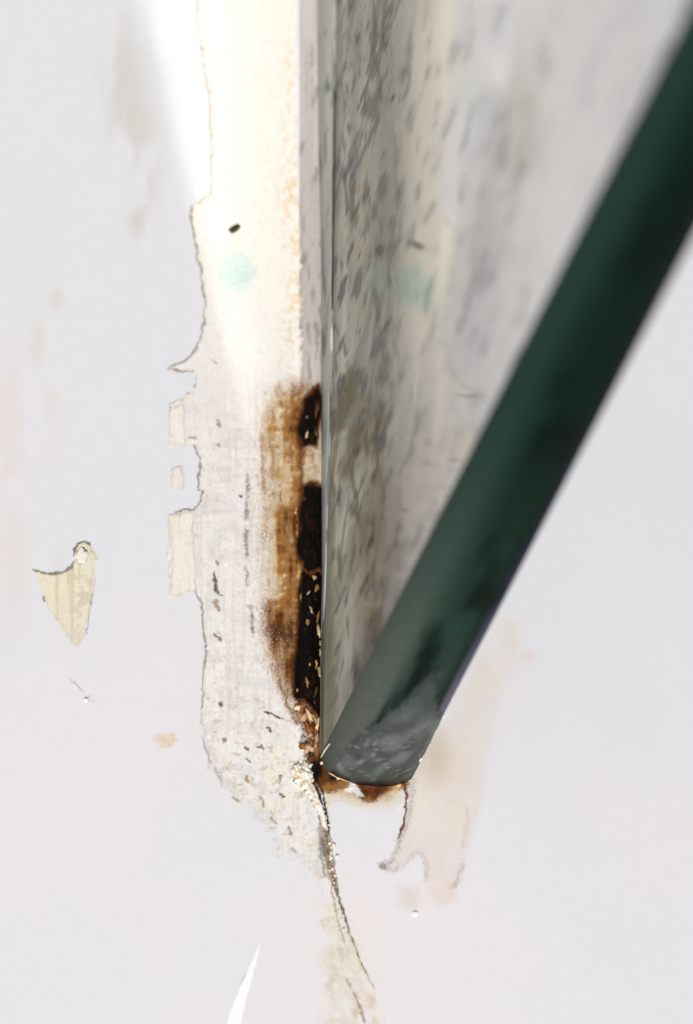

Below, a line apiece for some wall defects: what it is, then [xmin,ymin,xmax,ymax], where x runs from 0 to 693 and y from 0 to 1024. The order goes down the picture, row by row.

peeling [32,540,99,647]
peeling [166,0,389,1024]
corrosion [243,372,415,839]
crack [312,775,375,1023]